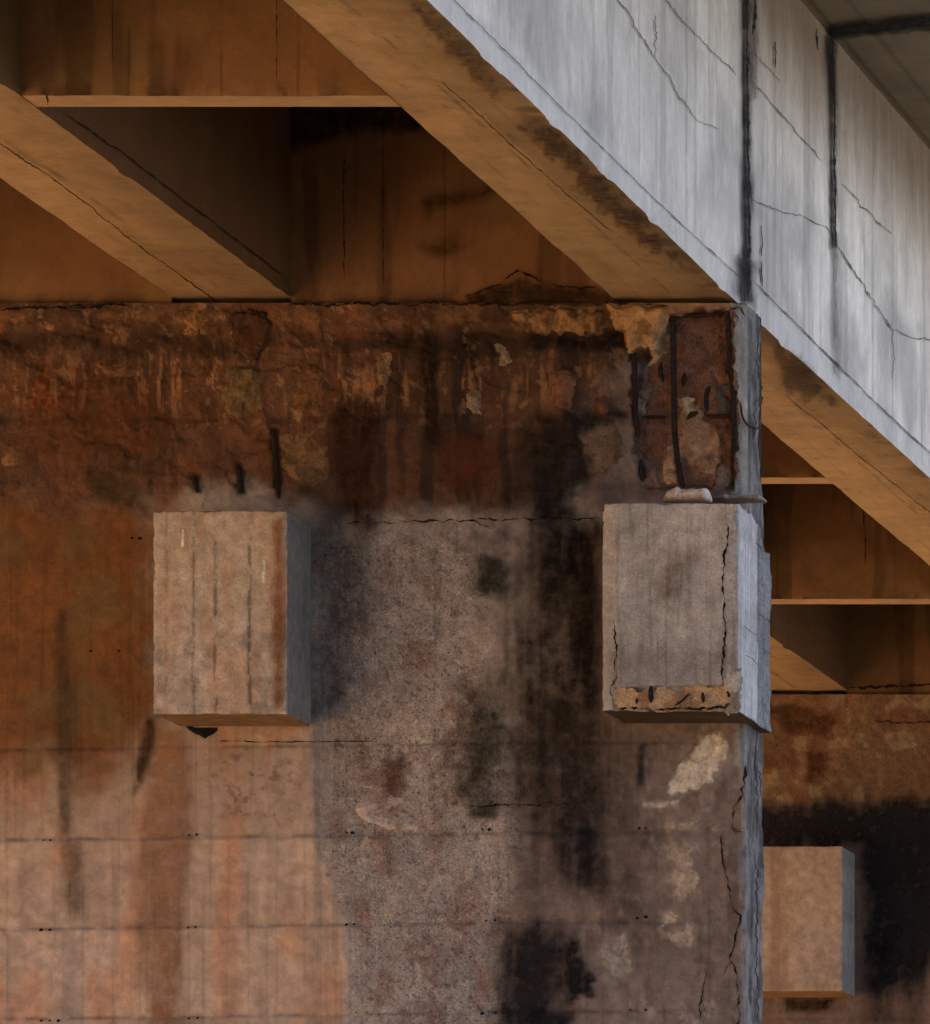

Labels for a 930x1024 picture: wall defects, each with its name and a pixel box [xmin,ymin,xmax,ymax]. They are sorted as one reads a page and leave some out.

crack [1,144,217,303]
crack [69,116,282,275]
crack [442,0,930,473]
damp [738,0,757,302]
damp [827,16,930,371]
spalling [509,303,763,492]
crack [348,517,601,529]
damp [516,410,627,884]
spalling [614,668,743,715]
crack [603,518,773,711]
damp [498,920,632,1024]
crack [699,731,762,1024]